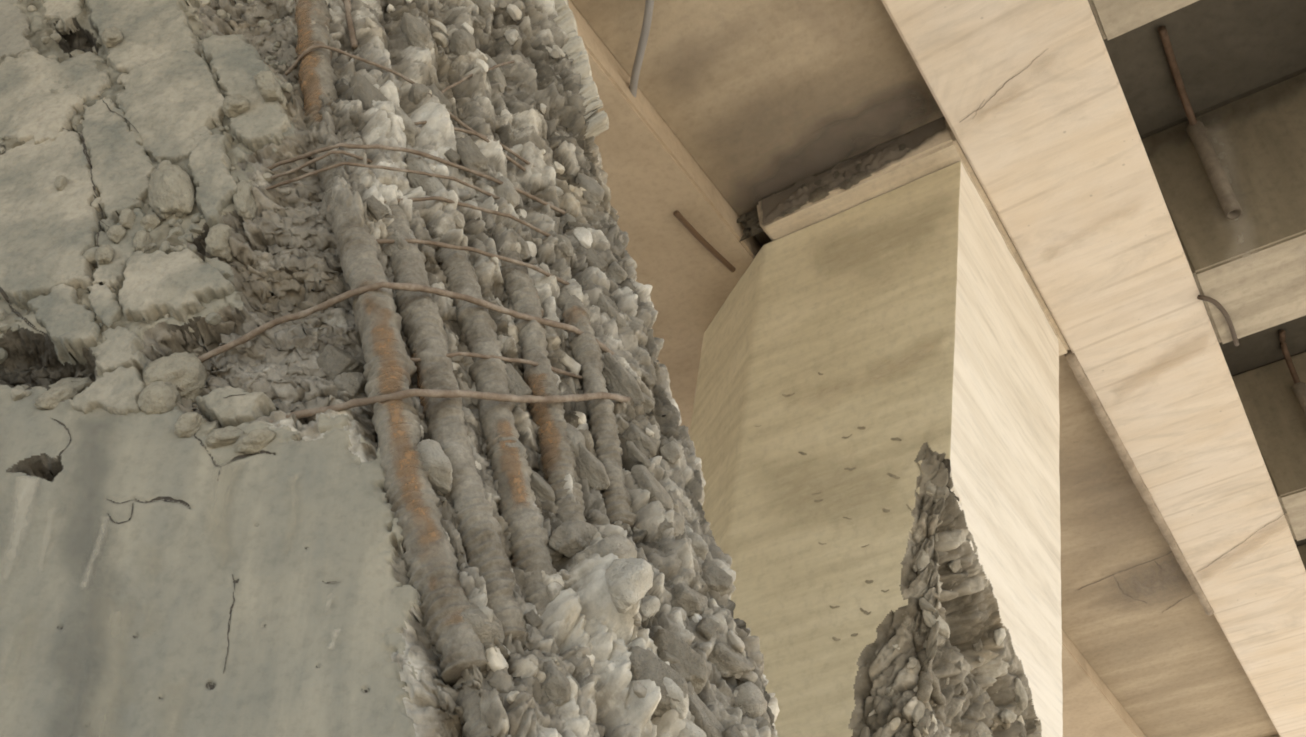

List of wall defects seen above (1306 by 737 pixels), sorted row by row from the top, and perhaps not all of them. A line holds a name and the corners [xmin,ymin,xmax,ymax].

crack [960,49,1047,122]
spalling [779,154,873,217]
spalling [0,0,780,737]
crack [108,497,191,524]
crack [223,574,236,674]
spalling [832,442,1042,737]